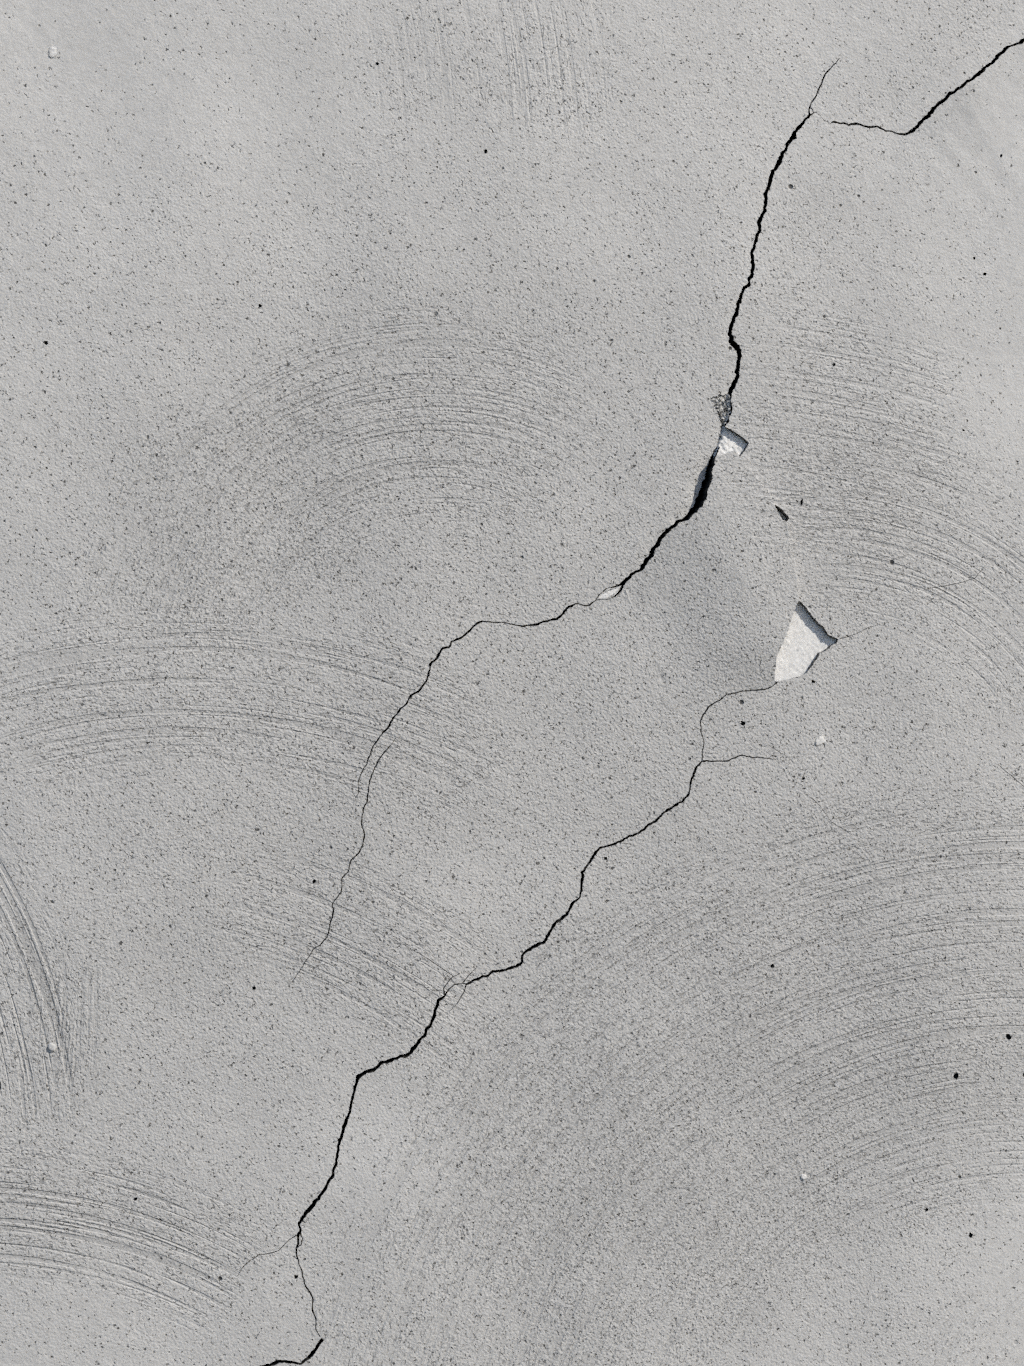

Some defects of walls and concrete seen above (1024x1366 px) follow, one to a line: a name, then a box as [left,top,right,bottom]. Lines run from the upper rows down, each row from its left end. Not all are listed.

crack [293,38,1024,980]
flaking render [599,394,838,755]
crack [238,681,792,1366]